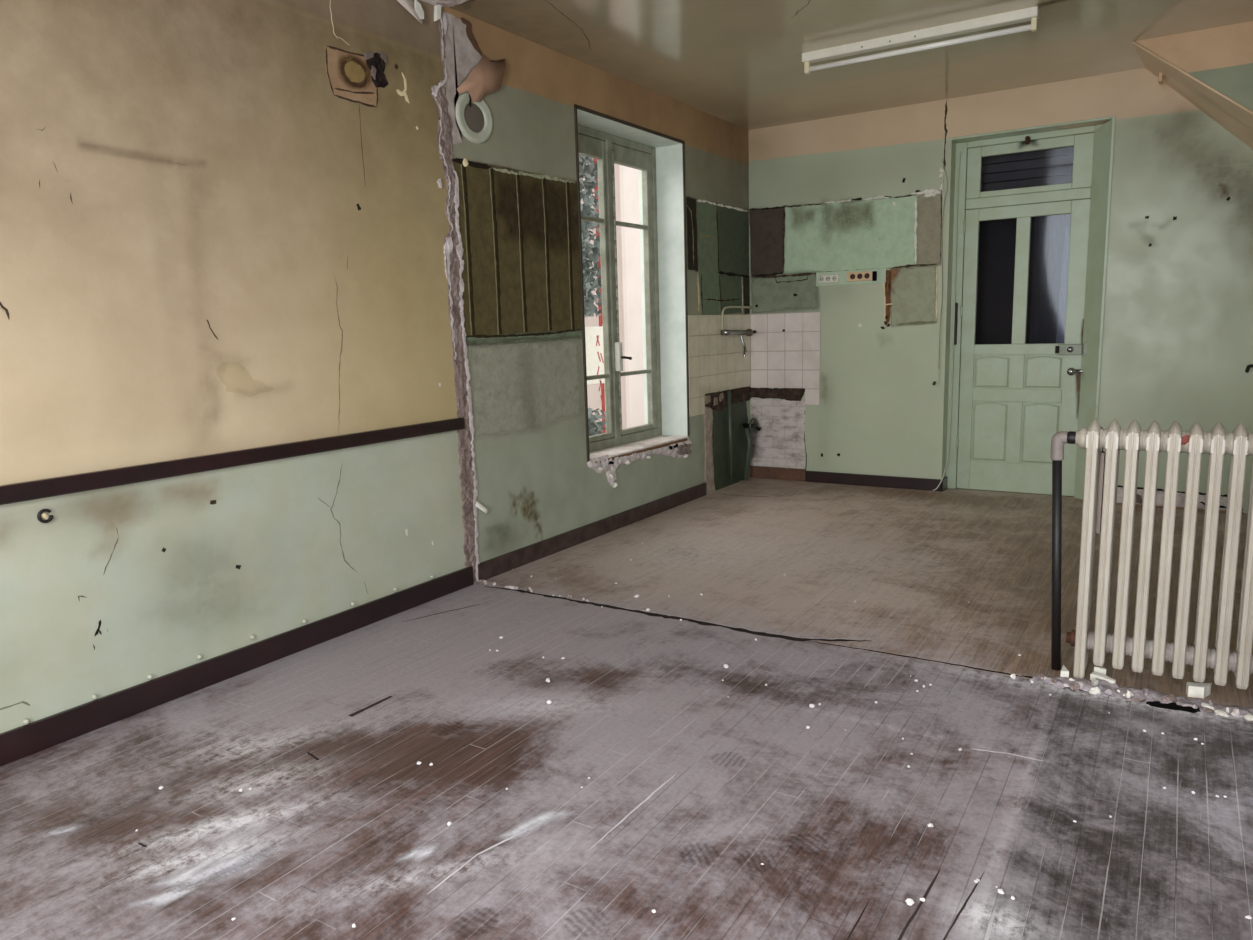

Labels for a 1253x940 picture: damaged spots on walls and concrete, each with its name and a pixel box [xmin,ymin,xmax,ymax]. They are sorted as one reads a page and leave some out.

flaking render [431,12,482,144]
peeling [436,170,463,281]
flaking render [587,386,805,493]
crack [318,466,368,593]